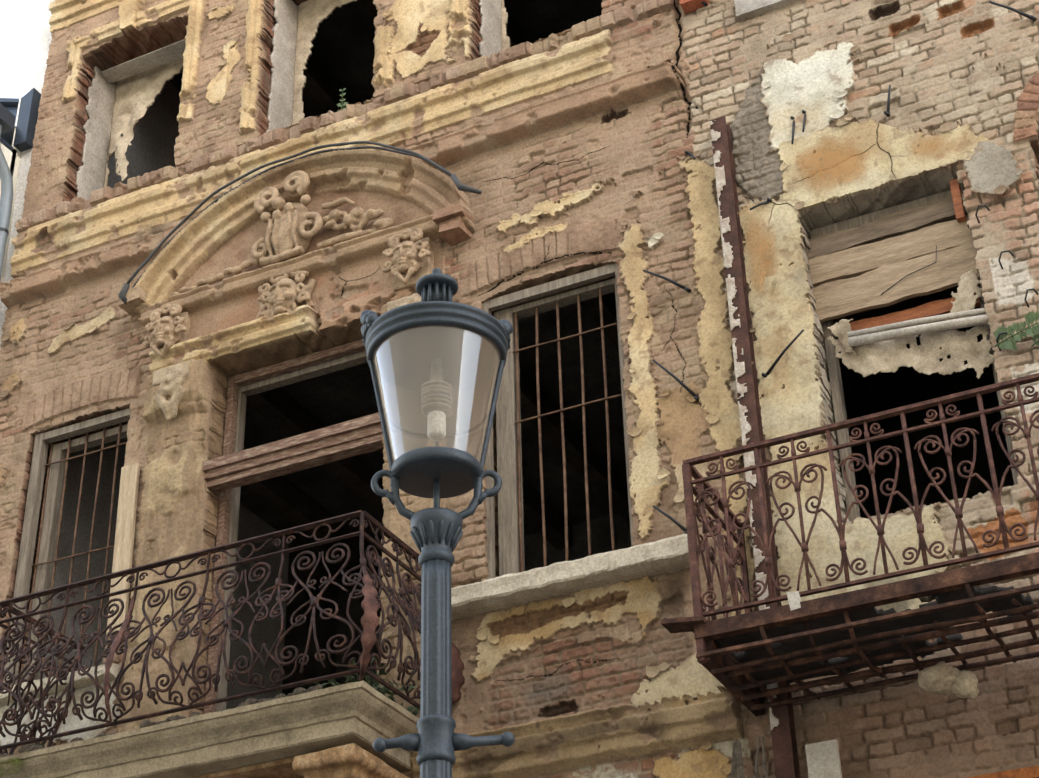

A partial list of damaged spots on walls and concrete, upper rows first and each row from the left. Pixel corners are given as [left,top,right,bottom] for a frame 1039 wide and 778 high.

peeling [207,2,236,19]
peeling [205,37,243,106]
peeling [381,0,452,78]
crack [666,0,698,138]
crack [743,124,896,225]
peeling [496,176,618,254]
peeling [48,305,118,353]
peeling [617,39,989,616]
flaking render [469,575,726,730]
peeling [767,683,779,730]
peeling [652,742,732,778]